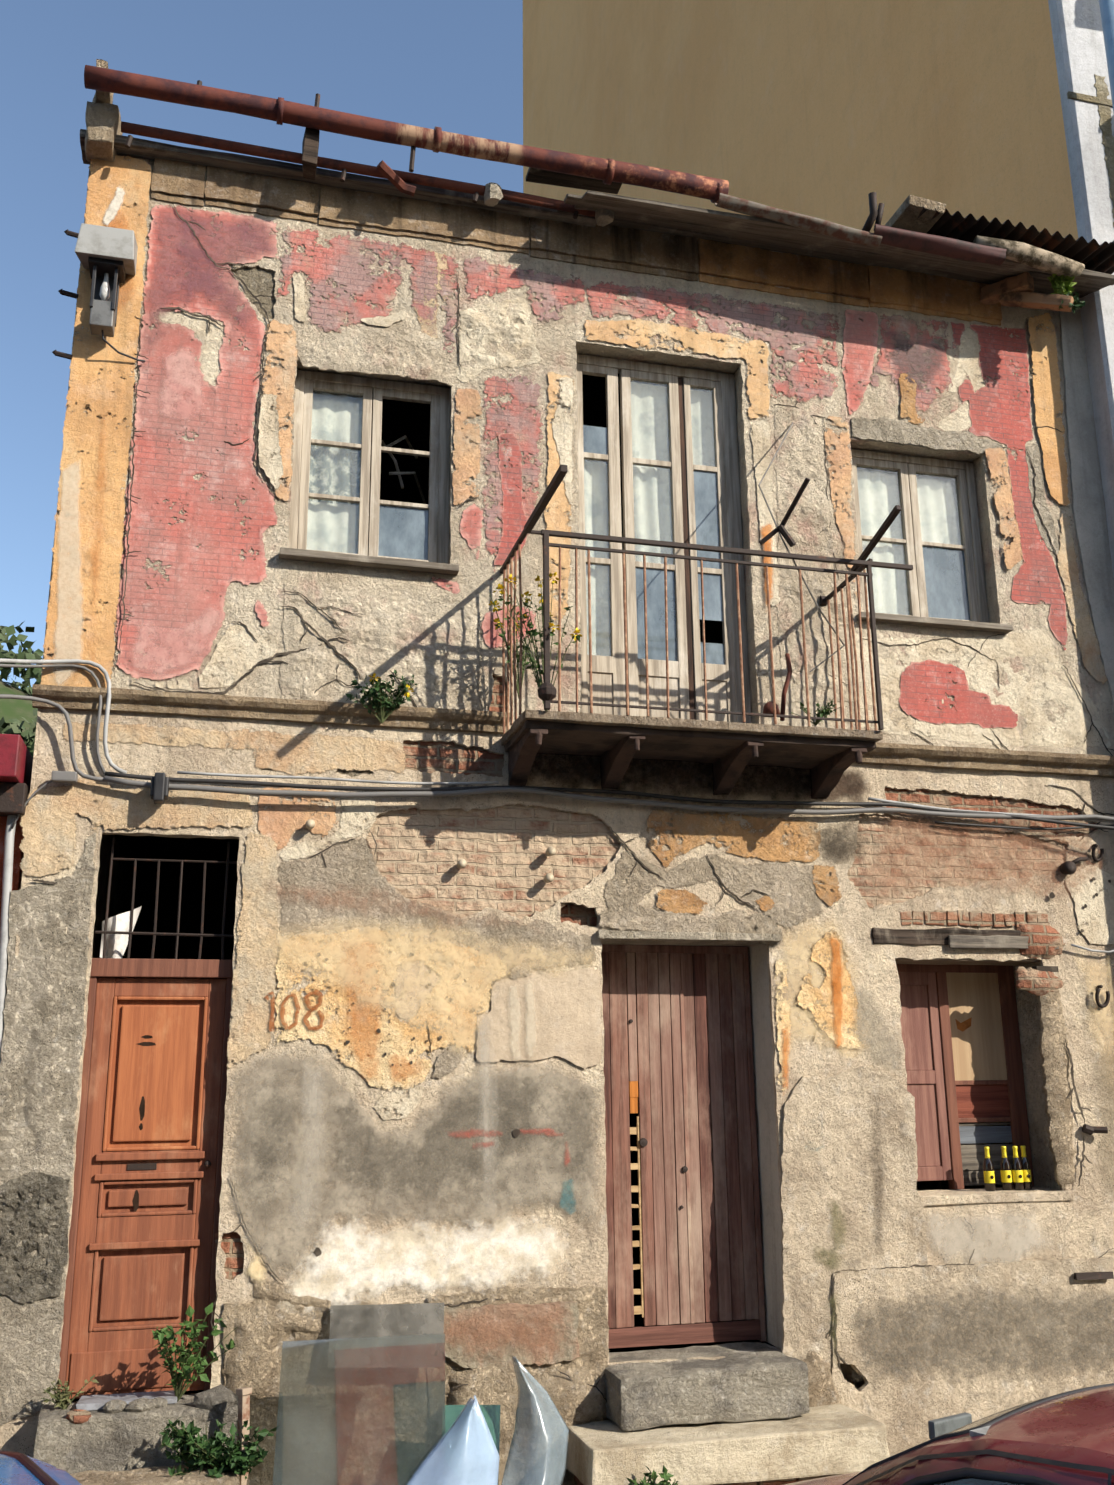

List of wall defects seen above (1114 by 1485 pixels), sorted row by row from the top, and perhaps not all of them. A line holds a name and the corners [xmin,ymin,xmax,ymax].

flaking render [159,309,225,386]
flaking render [231,267,276,319]
peeling [293,275,306,321]
flaking render [899,327,985,432]
peeling [258,394,283,496]
crack [118,307,417,707]
flaking render [1025,443,1059,555]
flaking render [335,765,374,777]
flaking render [257,768,621,927]
leakage [233,983,599,1309]
flaking render [215,1232,244,1280]
crack [828,1218,977,1370]